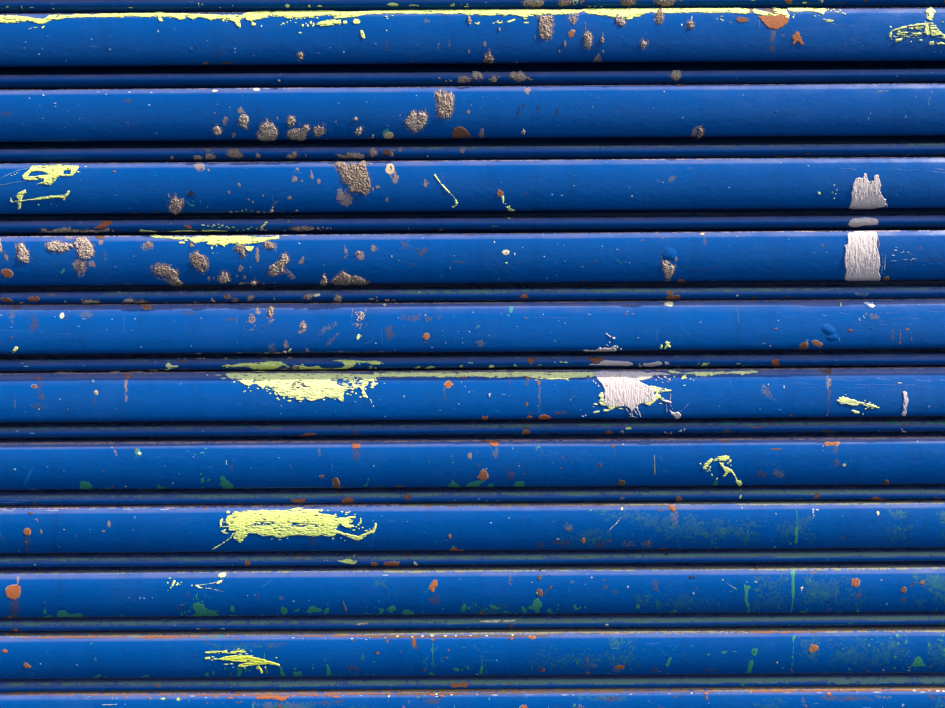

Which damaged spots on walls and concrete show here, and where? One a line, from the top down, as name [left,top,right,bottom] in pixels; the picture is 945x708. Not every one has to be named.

rust [736,0,792,29]
rust [5,584,20,599]